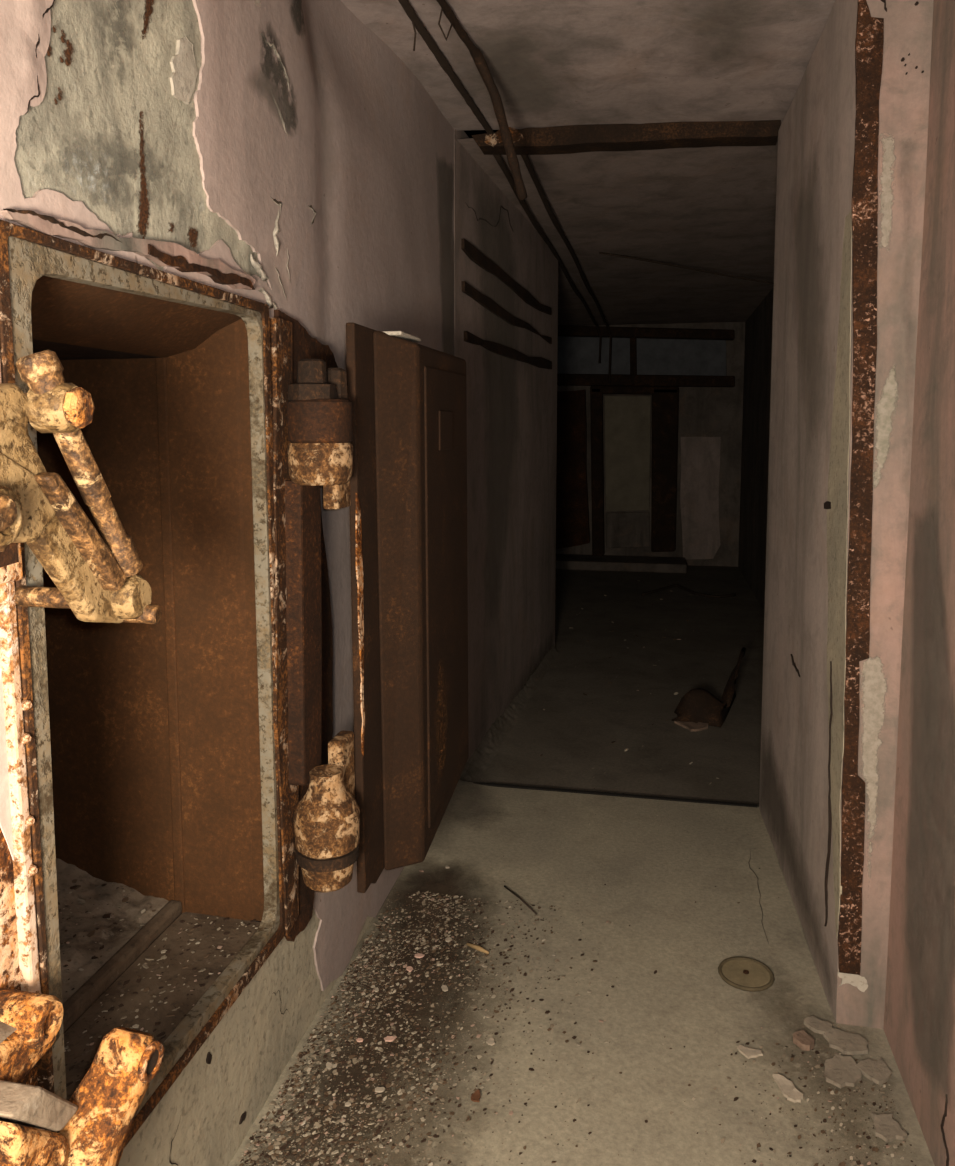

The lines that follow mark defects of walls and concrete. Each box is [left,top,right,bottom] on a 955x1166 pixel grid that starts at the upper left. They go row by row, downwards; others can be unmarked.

peeling [0,0,296,310]
peeling [824,211,852,939]
peeling [861,656,887,874]
peeling [118,910,339,1166]